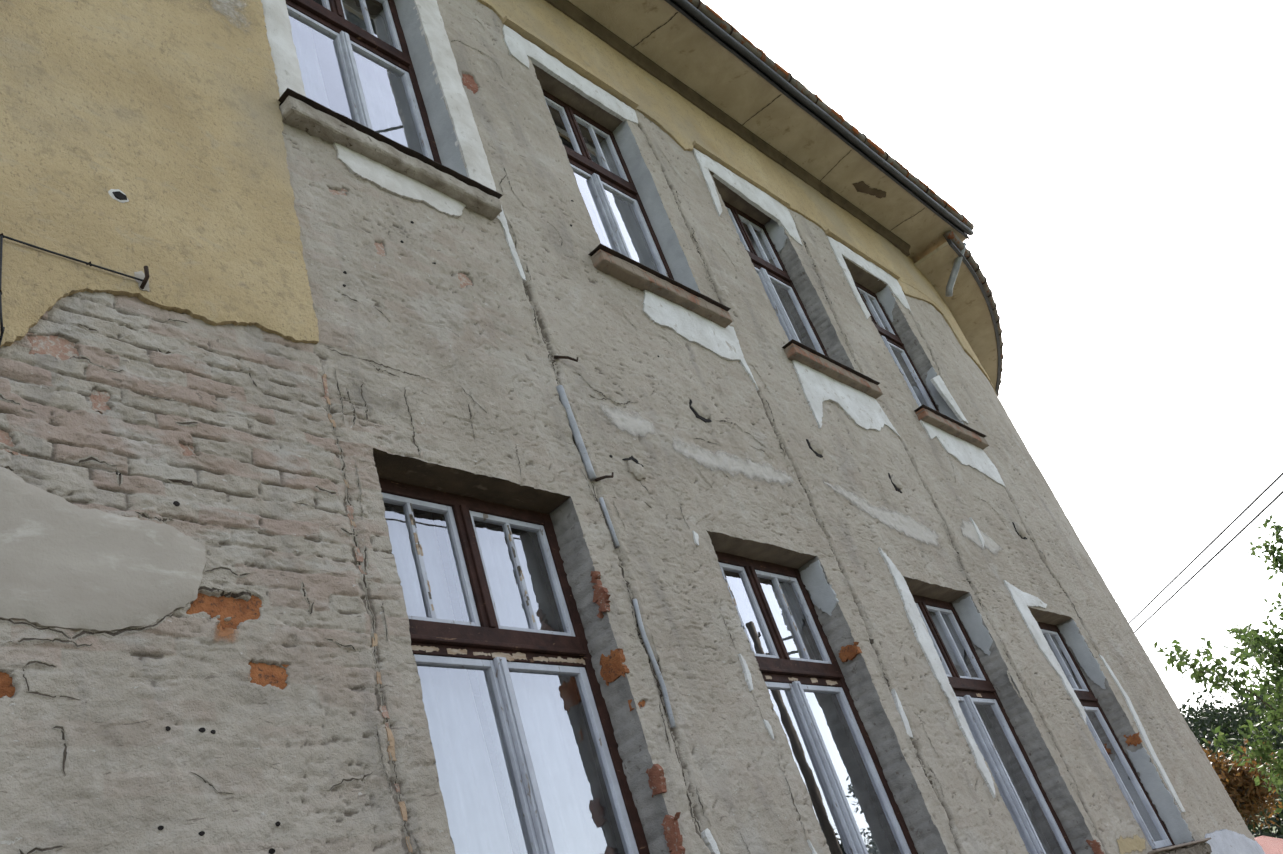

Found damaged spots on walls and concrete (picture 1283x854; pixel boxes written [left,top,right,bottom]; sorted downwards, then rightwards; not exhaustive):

peeling [333,142,466,218]
peeling [642,290,759,391]
peeling [792,360,901,437]
flaking render [186,593,262,630]
crack [293,344,487,854]
flaking render [590,571,611,619]
flaking render [0,672,15,698]
crack [0,566,263,776]
flaking render [248,662,289,689]
flaking render [411,645,630,686]
flaking render [646,764,667,797]
flaking render [661,812,685,854]